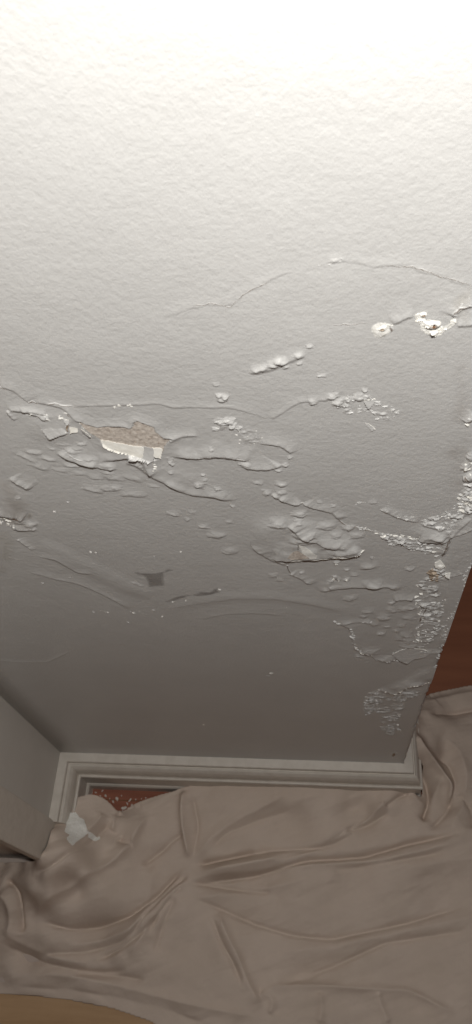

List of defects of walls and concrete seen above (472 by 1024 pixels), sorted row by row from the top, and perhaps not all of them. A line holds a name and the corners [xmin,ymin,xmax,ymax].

spalling [371,322,394,338]
peeling [5,399,198,475]
flaking render [420,483,472,531]
flaking render [332,533,471,737]